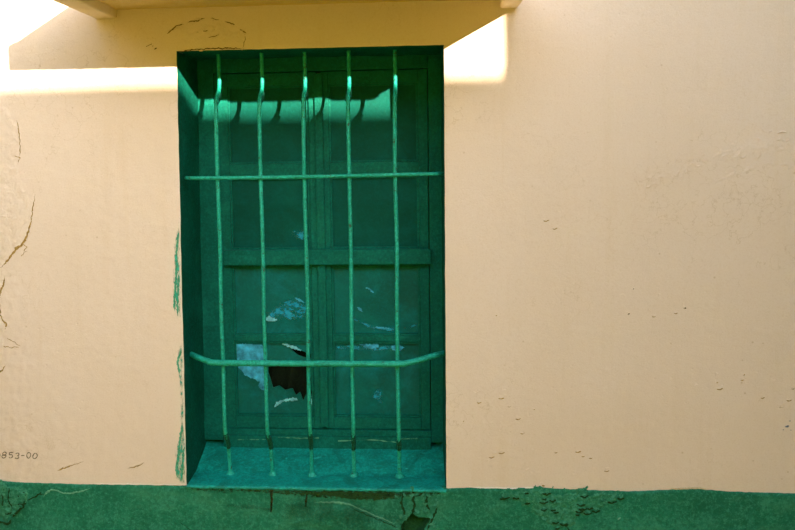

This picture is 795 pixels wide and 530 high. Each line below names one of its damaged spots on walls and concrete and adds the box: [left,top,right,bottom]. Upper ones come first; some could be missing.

spalling [394,486,439,530]
spalling [473,481,628,530]